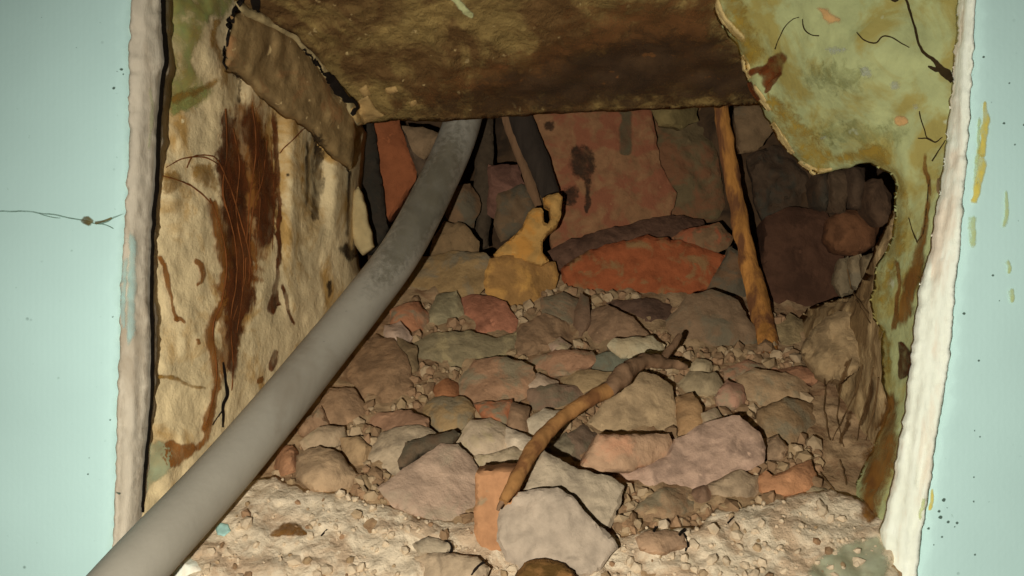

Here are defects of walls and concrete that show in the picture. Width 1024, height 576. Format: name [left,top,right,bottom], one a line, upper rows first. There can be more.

crack [774,17,819,49]
crack [856,0,953,83]
spalling [350,85,384,126]
corrosion [747,54,786,101]
crack [0,210,119,229]
flaking render [353,187,375,256]
spalling [112,0,231,547]
corrosion [157,99,295,467]
flaking render [713,0,990,576]
crack [212,362,229,427]
corrosion [861,394,898,523]
spalling [173,557,201,576]